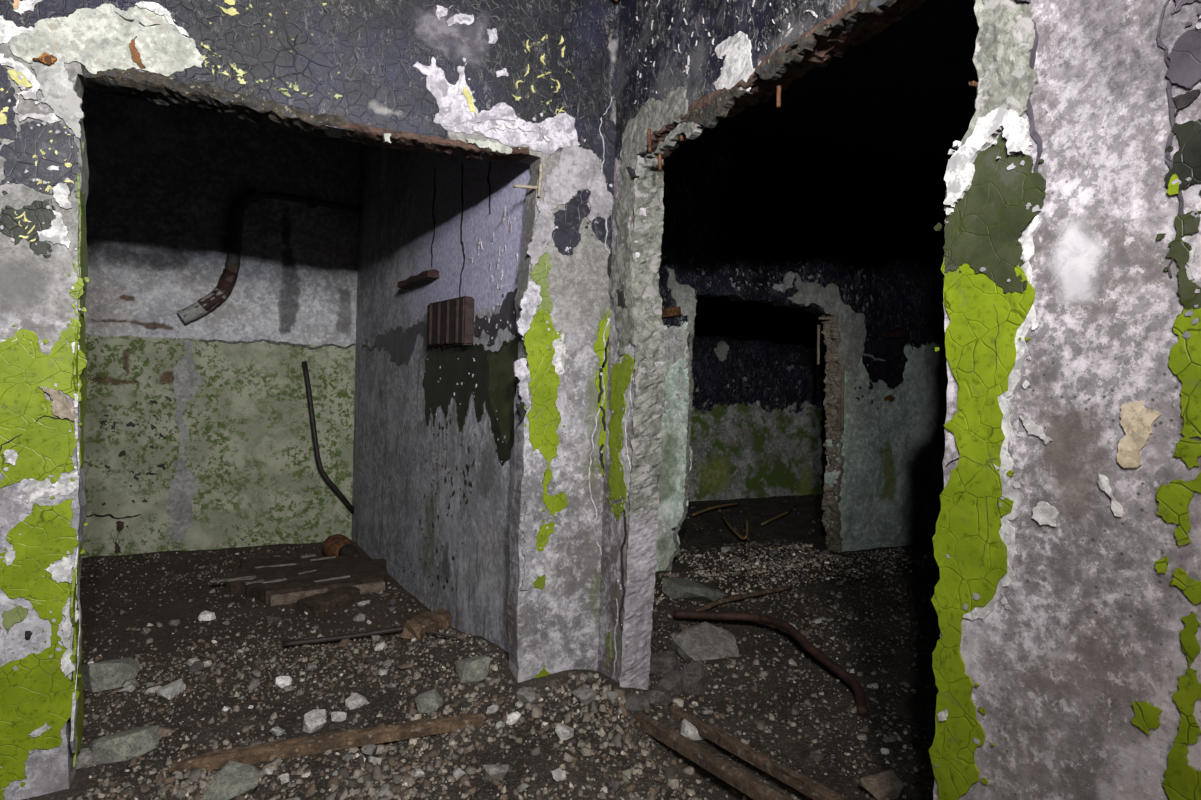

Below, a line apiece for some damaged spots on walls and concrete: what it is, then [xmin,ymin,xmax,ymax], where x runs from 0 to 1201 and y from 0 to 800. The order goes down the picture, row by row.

peeling [1164,0,1201,196]
peeling [0,0,346,800]
peeling [929,0,1059,800]
peeling [1098,474,1123,517]
peeling [1117,401,1162,468]
peeling [1156,211,1201,547]
peeling [1132,701,1162,735]
peeling [1154,556,1201,800]